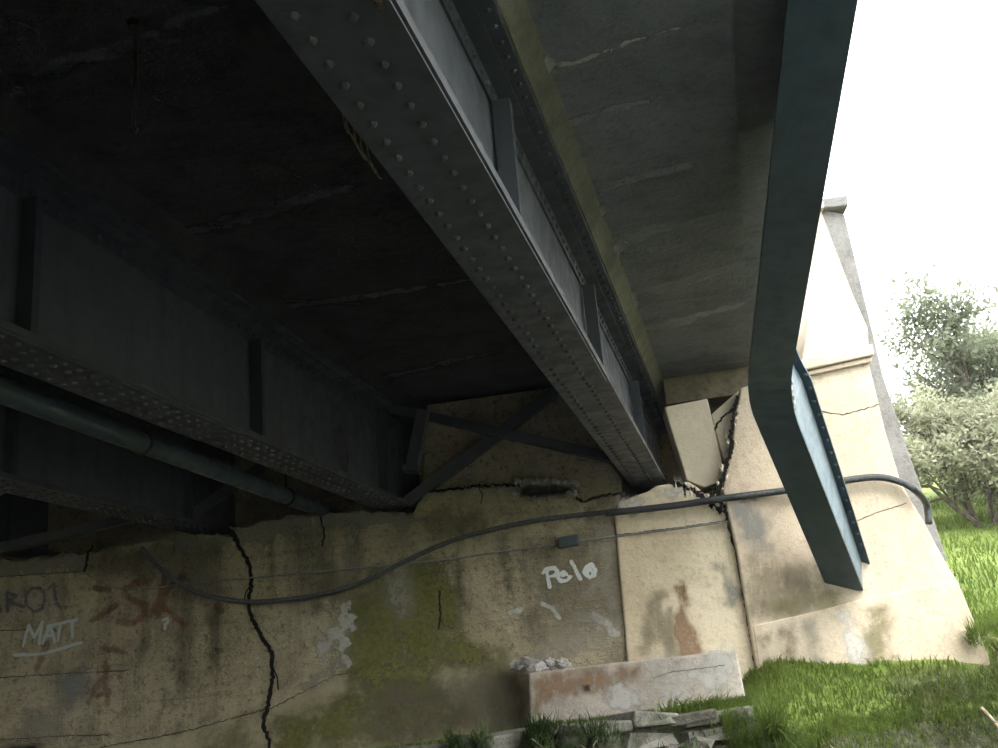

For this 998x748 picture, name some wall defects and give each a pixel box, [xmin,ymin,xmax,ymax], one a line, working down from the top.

crack [420,483,520,504]
crack [571,492,622,503]
crack [617,396,755,665]
crack [0,532,363,748]
damp [300,600,358,690]
rust [667,584,701,656]